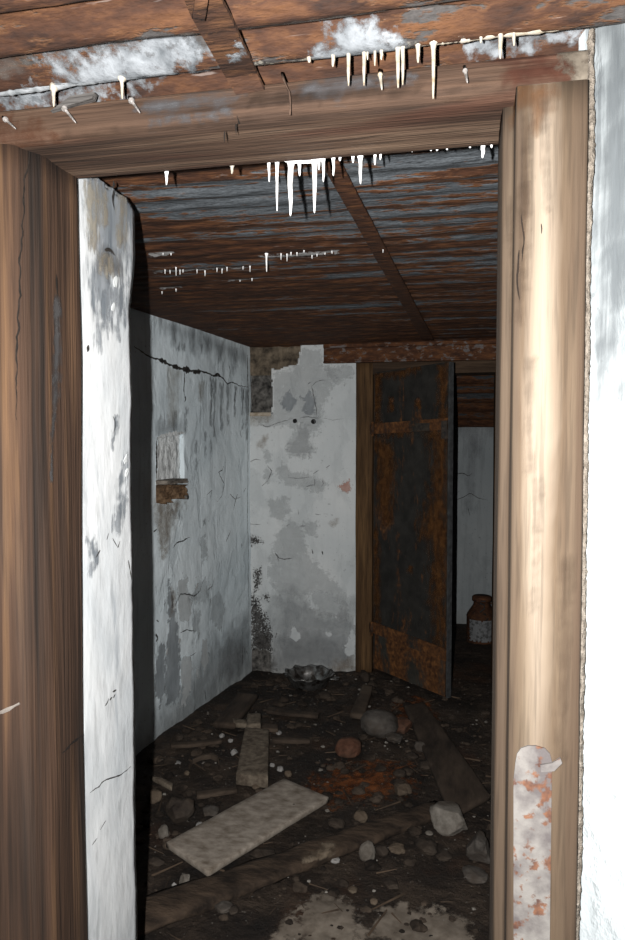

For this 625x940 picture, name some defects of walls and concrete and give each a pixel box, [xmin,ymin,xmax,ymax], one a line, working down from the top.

water stain [0,33,213,110]
water stain [243,11,625,378]
crack [134,346,330,438]
flaking render [250,346,301,376]
crack [207,459,330,664]
water stain [251,567,273,654]